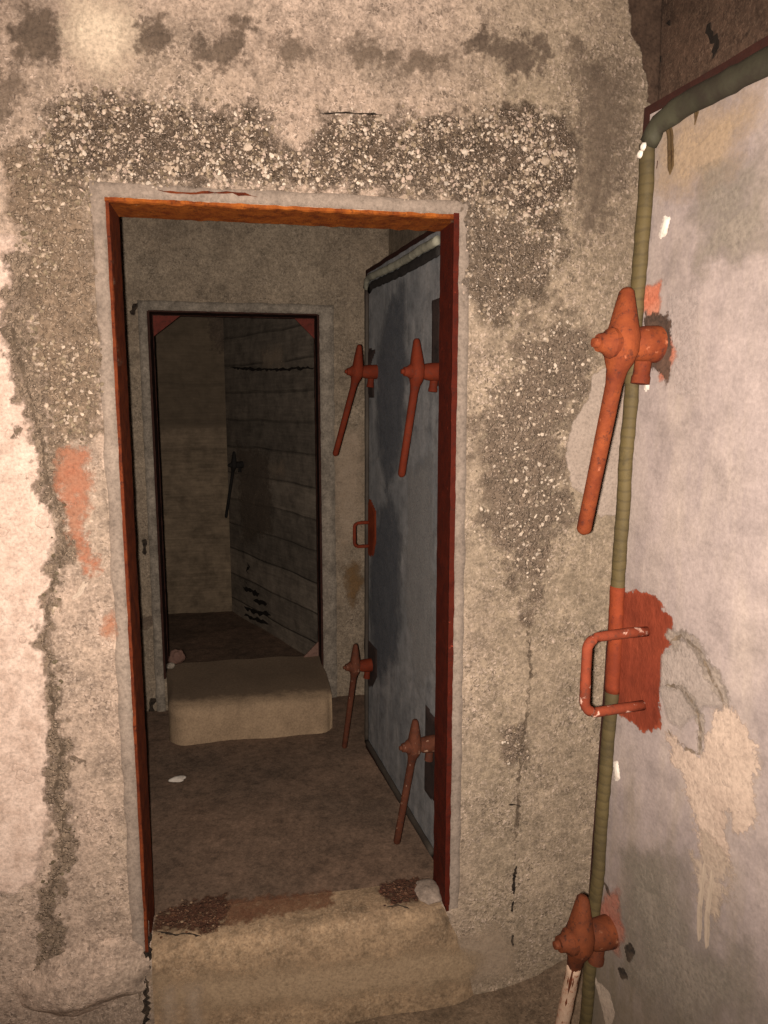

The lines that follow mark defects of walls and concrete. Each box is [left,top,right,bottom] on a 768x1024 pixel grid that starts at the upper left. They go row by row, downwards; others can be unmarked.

leakage [0,0,171,120]
leakage [190,15,257,74]
leakage [279,32,311,62]
leakage [347,34,449,77]
rust [55,447,97,573]
spalling [0,80,606,894]
flaking render [596,380,625,517]
crack [509,622,533,946]
peeling [665,703,761,949]
crack [138,932,153,1024]